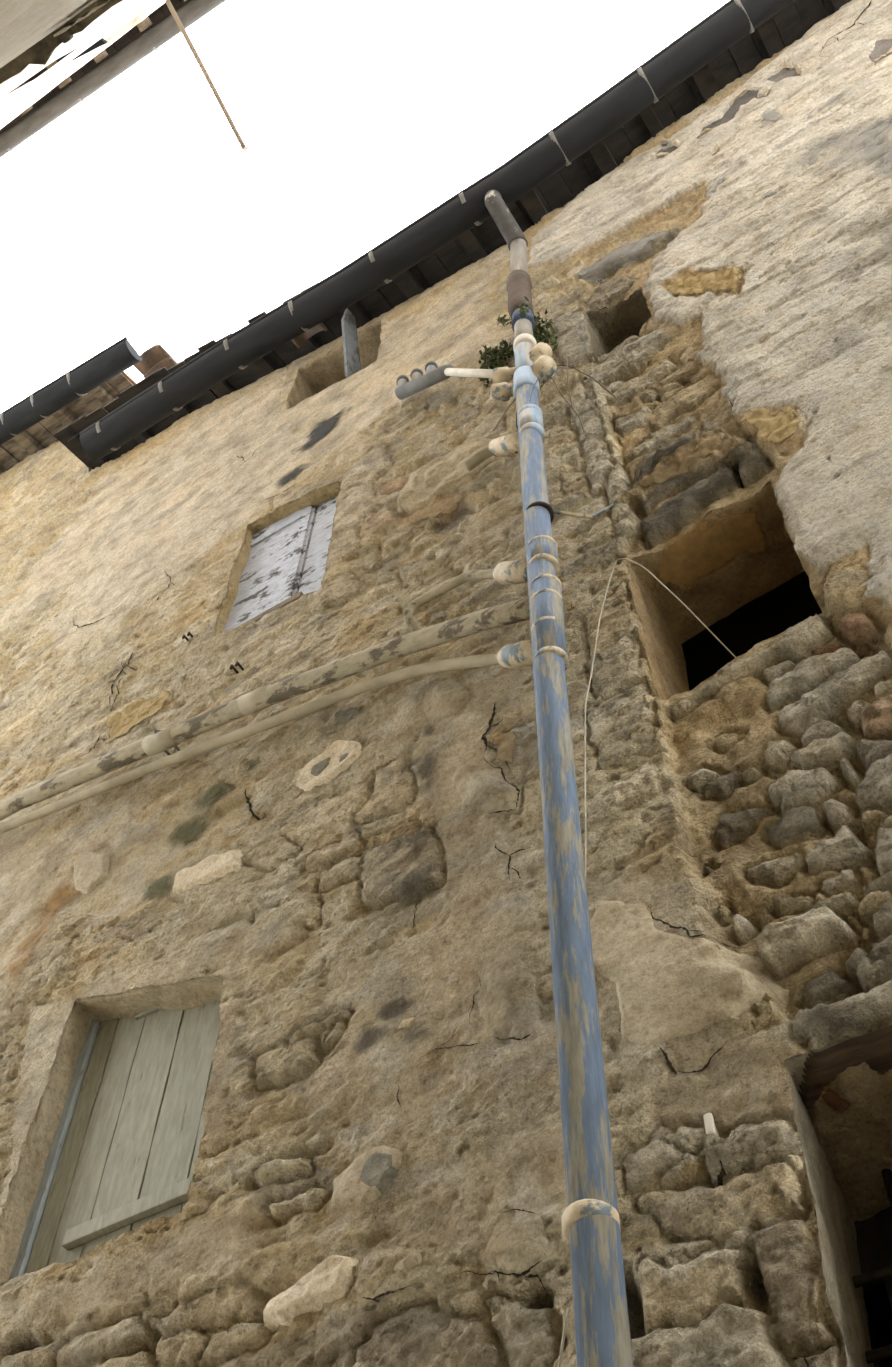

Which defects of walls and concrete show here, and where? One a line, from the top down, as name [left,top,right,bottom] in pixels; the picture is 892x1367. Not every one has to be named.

spalling [666,265,739,296]
spalling [622,406,800,494]
crack [481,703,509,767]
crack [648,906,735,948]
crack [659,1043,726,1076]